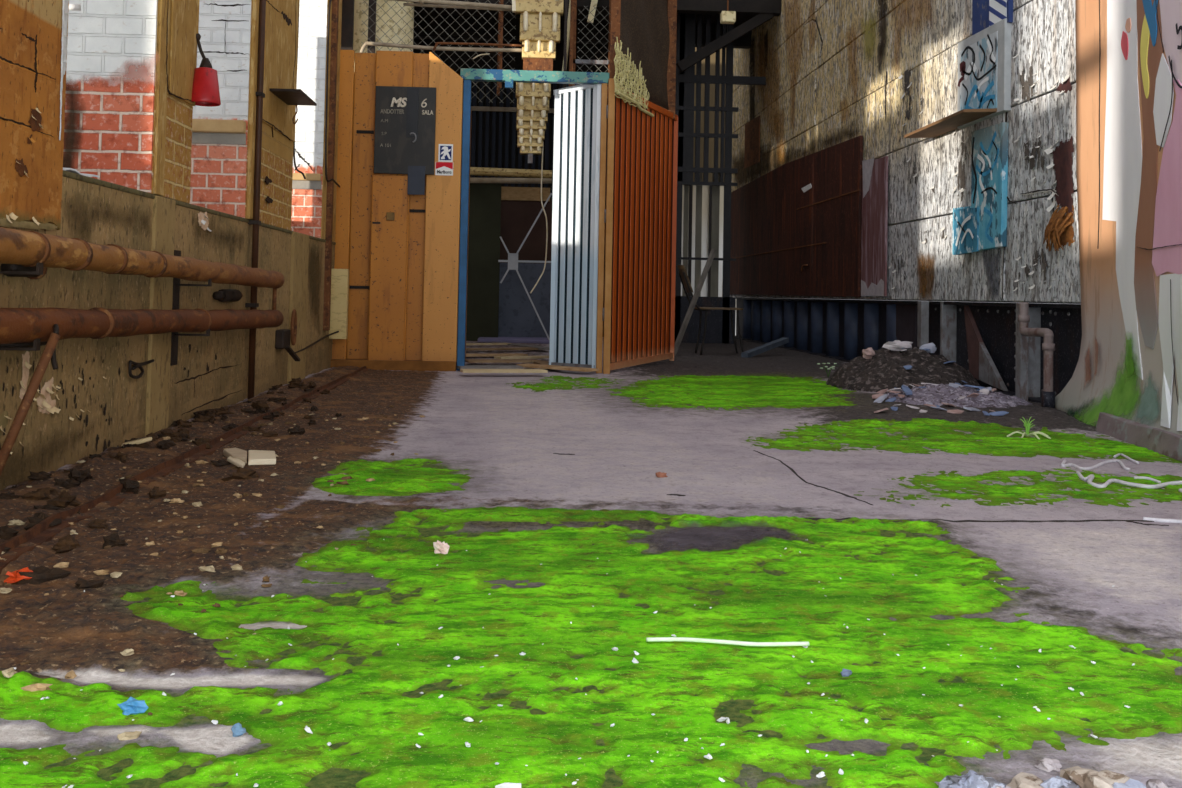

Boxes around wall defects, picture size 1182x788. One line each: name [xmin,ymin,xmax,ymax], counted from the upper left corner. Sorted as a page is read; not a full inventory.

crack [0,117,54,139]
crack [0,28,56,93]
peeling [111,64,151,83]
peeling [898,70,924,127]
peeling [1013,54,1072,105]
peeling [951,129,969,201]
spalling [1014,133,1074,213]
rust [730,135,863,297]
peeling [1013,249,1057,291]
peeling [3,351,120,452]
crack [753,450,1169,526]